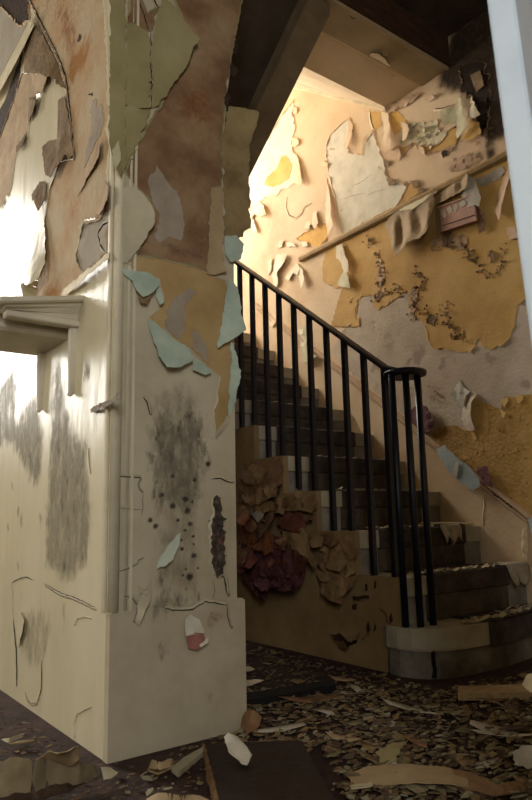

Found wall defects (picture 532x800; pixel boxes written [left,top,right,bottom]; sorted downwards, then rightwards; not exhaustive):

water stain [485,124,494,159]
spalling [0,0,302,438]
peeling [268,60,532,515]
water stain [0,364,90,574]
water stain [171,497,196,557]
spalling [208,493,229,581]
crack [11,577,97,706]
peeling [185,615,208,650]
crack [164,575,233,629]